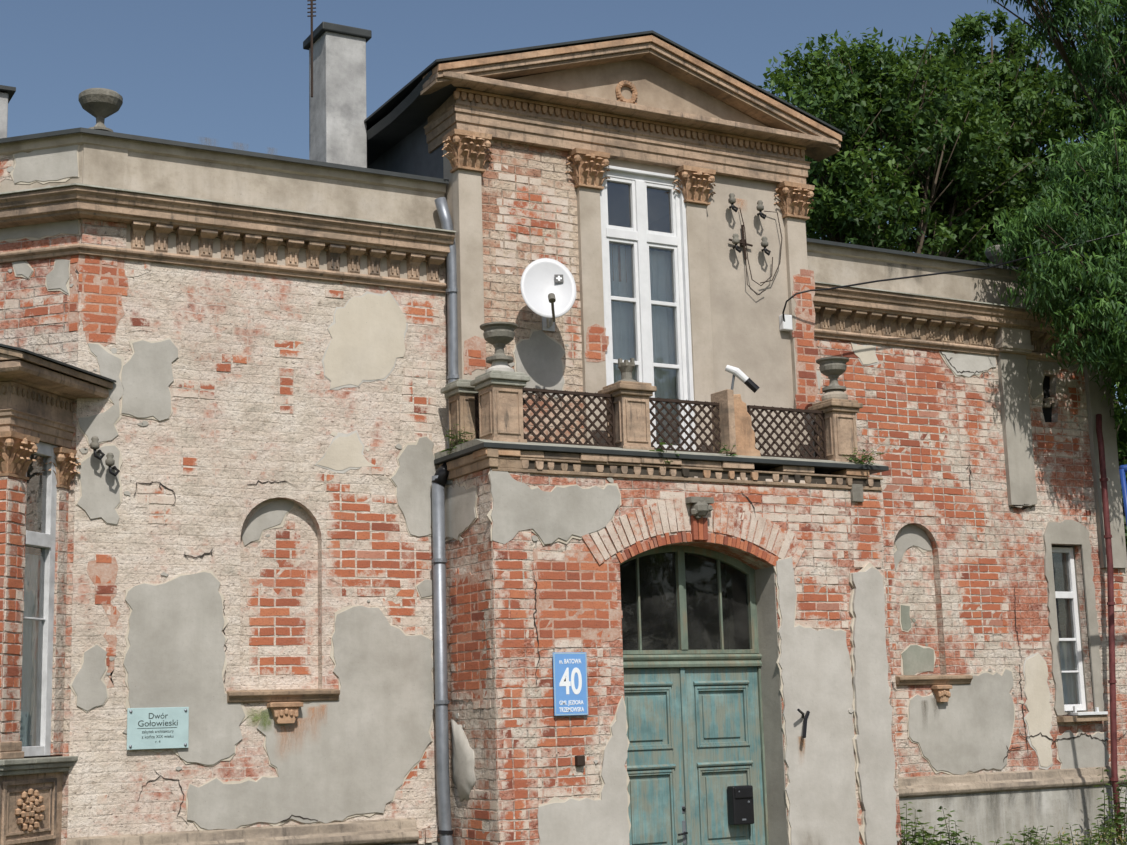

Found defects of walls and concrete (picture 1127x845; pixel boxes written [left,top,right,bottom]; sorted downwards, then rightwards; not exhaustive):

flaking render [0,155,13,182]
flaking render [493,164,577,294]
flaking render [0,255,154,354]
flaking render [463,336,487,375]
flaking render [562,292,609,373]
flaking render [1032,372,1084,460]
flaking render [316,361,437,635]
flaking render [641,269,1043,674]
flaking render [246,521,313,680]
flaking render [448,532,623,845]
flaking render [892,690,910,748]